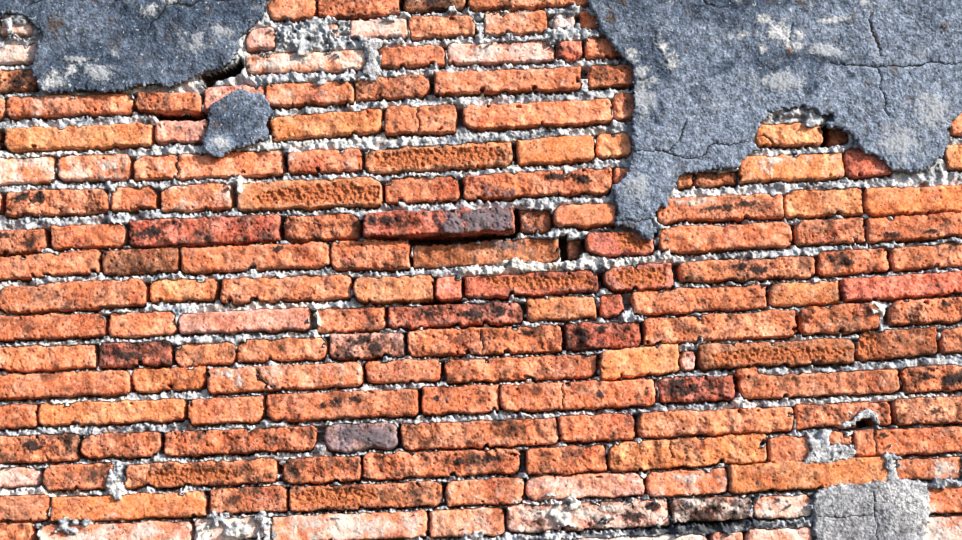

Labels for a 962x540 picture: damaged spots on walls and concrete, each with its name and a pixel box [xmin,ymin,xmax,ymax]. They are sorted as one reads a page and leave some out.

crack [831,15,961,115]
crack [638,121,773,159]
spalling [373,145,505,169]
spalling [252,181,380,205]
spalling [607,232,651,252]
spalling [486,273,593,291]
spalling [610,267,668,288]
spalling [711,333,880,365]
spalling [144,465,238,486]
spalling [294,487,379,508]